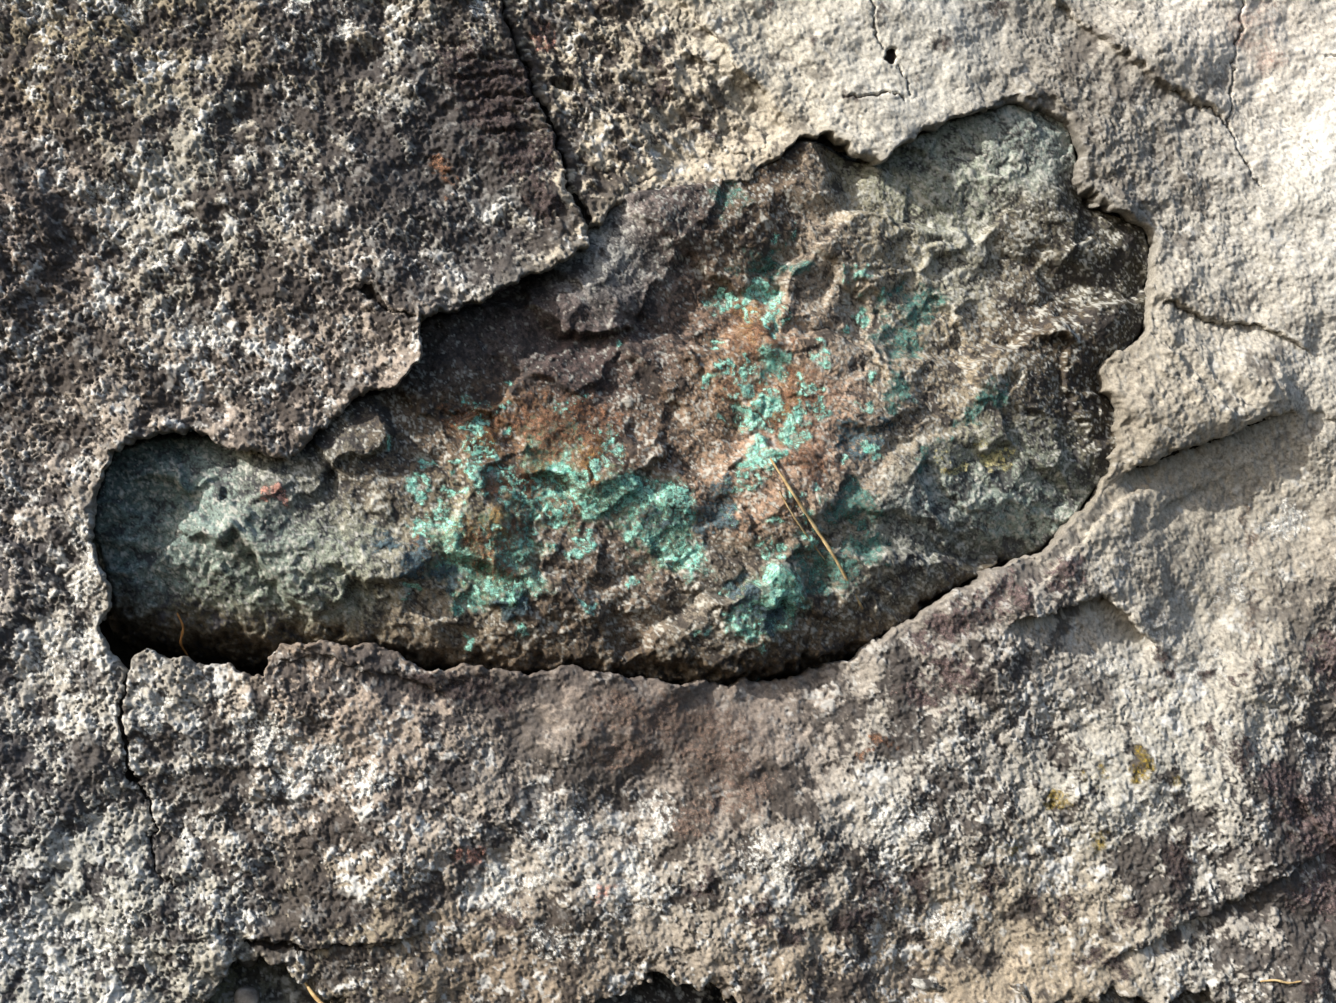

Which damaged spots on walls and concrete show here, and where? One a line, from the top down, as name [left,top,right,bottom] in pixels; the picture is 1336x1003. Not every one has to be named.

crack [501,0,592,225]
crack [843,0,909,100]
crack [1168,0,1260,186]
rust [439,391,624,580]
flaking render [70,0,1336,697]
rust [705,302,843,487]
crack [1136,418,1266,468]
crack [1163,301,1305,350]
spalling [1080,976,1303,1003]